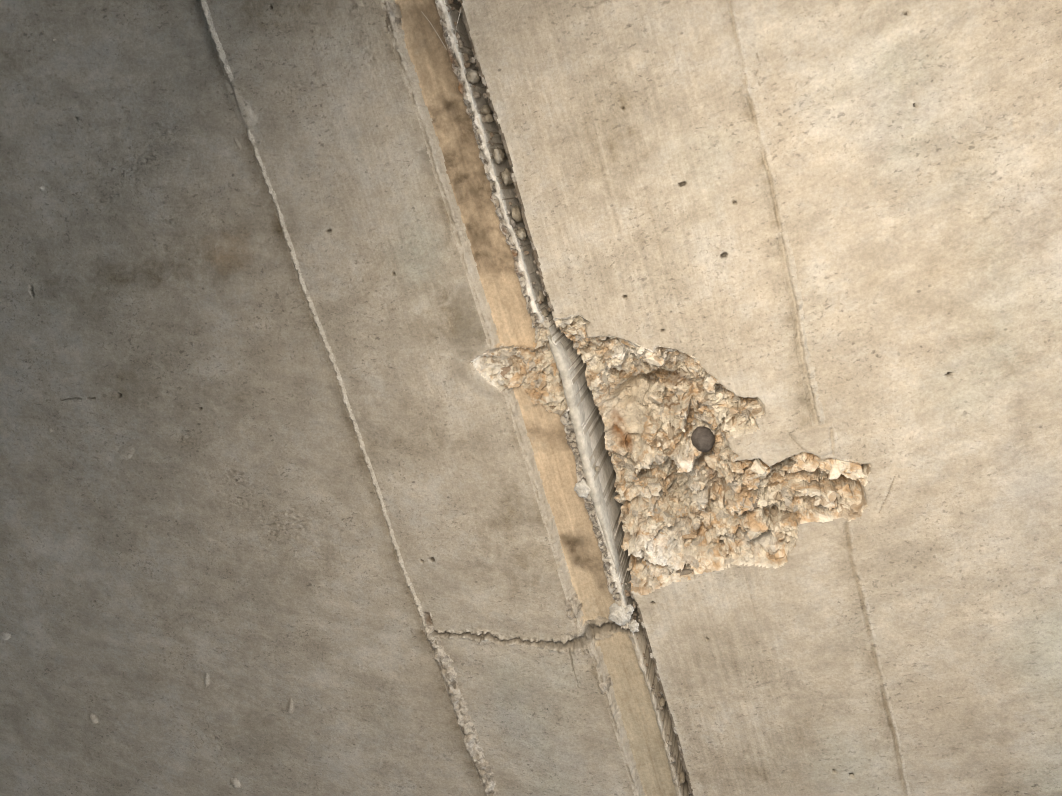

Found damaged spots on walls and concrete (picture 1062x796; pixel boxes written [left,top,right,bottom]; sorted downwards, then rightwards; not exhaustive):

crack [753,51,761,89]
spalling [435,0,871,795]
crack [426,611,638,693]